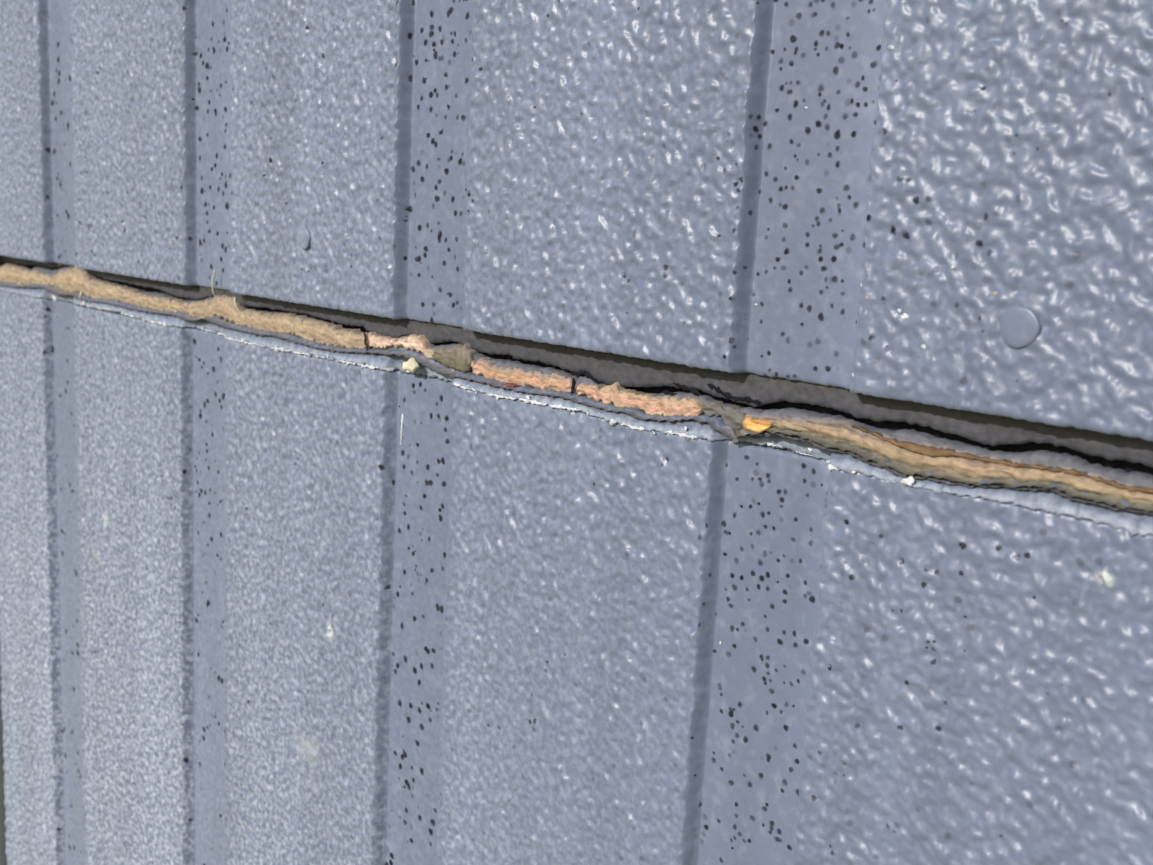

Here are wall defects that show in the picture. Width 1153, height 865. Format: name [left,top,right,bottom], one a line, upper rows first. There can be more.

crack [10,262,192,300]
crack [251,307,369,351]
crack [439,341,1153,475]